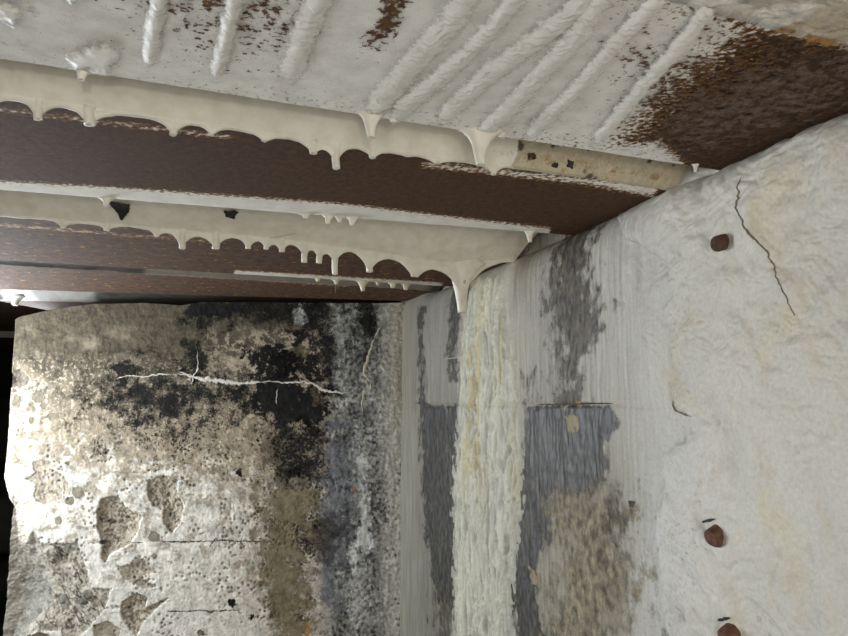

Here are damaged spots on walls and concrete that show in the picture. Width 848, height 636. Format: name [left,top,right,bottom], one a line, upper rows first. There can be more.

corrosion [166,0,226,69]
corrosion [226,0,303,74]
efflorescence [0,0,609,172]
efflorescence [526,0,667,138]
corrosion [594,22,668,92]
corrosion [618,21,848,160]
damp [0,190,538,382]
damp [66,302,385,636]
crack [117,328,380,413]
damp [417,306,458,636]
damp [511,220,640,636]